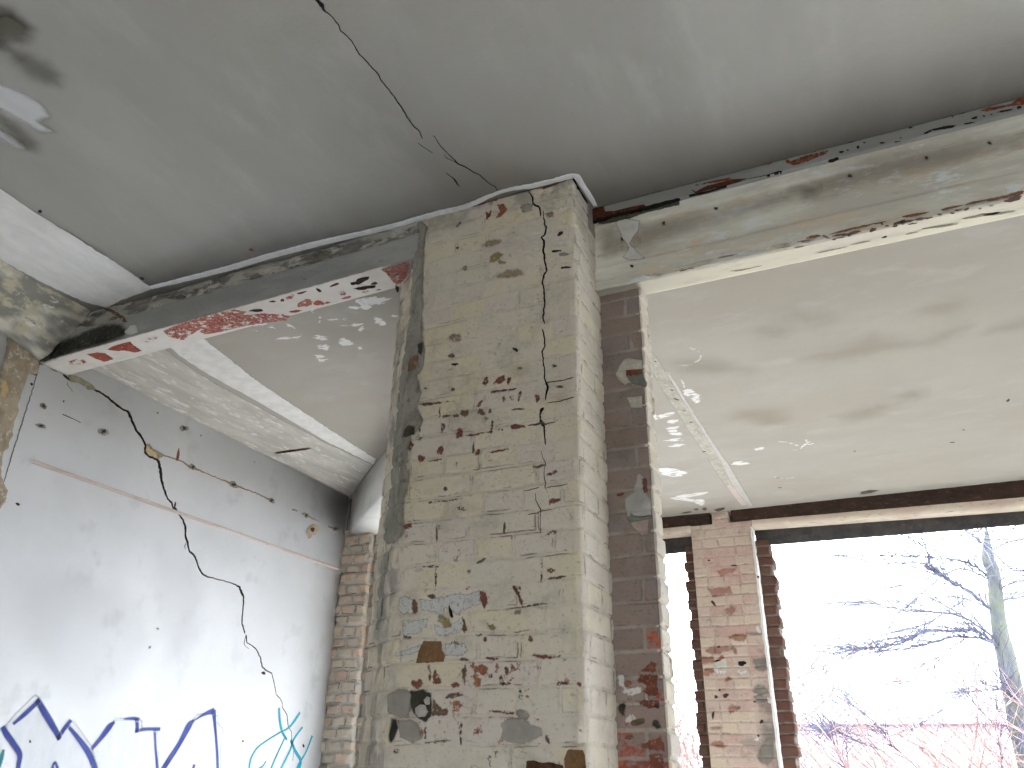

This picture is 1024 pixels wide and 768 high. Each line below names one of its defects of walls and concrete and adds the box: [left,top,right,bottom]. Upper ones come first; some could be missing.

crack [315,0,498,191]
corrosion [592,205,645,221]
corrosion [692,178,746,193]
corrosion [785,150,828,165]
spalling [0,338,40,508]
flaking render [68,262,410,496]
peeling [403,367,525,462]
crack [524,191,574,533]
crack [4,368,294,755]
peeling [387,565,550,754]
peeling [526,749,586,768]
peeling [618,661,665,768]